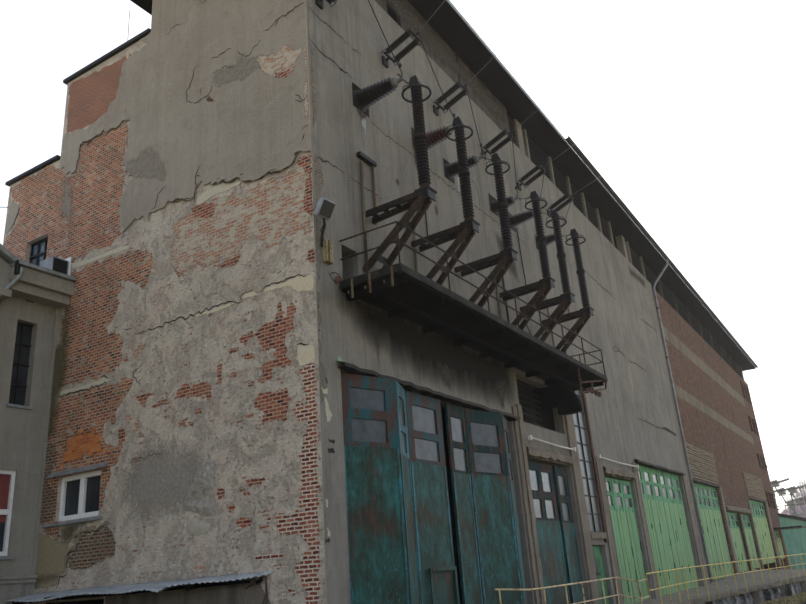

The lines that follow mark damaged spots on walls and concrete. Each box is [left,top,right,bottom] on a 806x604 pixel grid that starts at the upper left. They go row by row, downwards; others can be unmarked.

spalling [66,54,131,133]
crack [186,2,361,103]
spalling [257,44,317,127]
crack [153,166,201,209]
spalling [170,147,324,279]
spalling [3,119,236,589]
crack [126,274,308,334]
spalling [217,292,332,604]